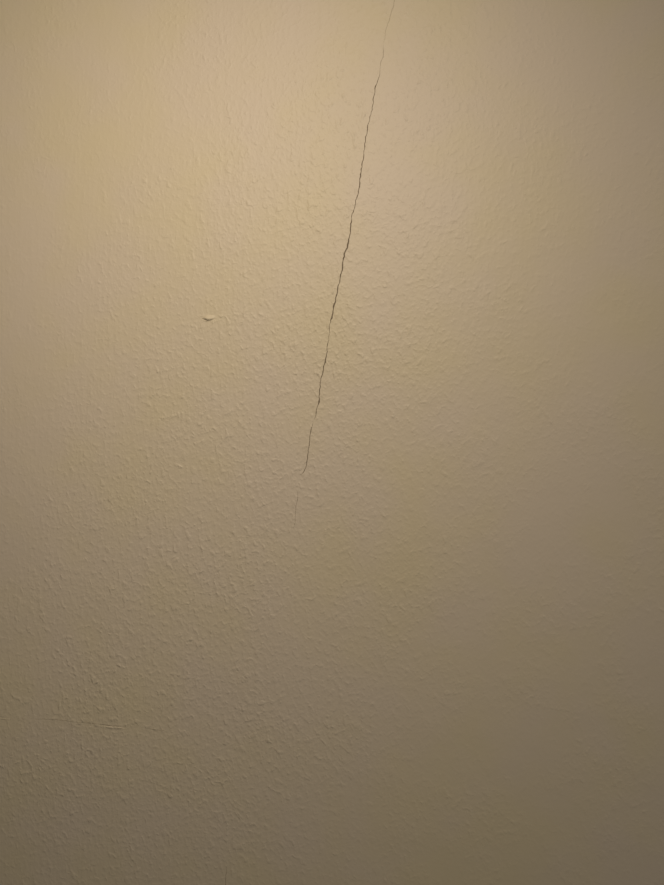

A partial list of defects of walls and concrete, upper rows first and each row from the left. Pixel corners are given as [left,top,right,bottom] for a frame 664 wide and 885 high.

crack [299,0,395,473]